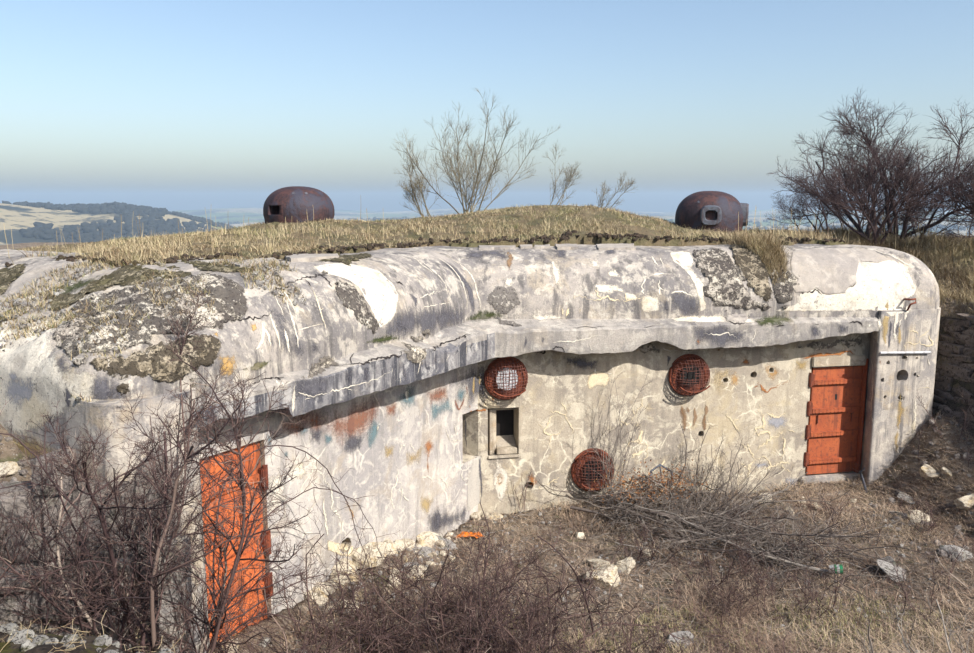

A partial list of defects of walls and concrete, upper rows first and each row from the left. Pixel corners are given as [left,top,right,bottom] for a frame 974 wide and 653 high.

water stain [551,250,566,285]
water stain [589,260,760,347]
peeling [670,248,916,316]
water stain [91,377,124,399]
crack [298,333,473,405]
crack [535,403,574,445]